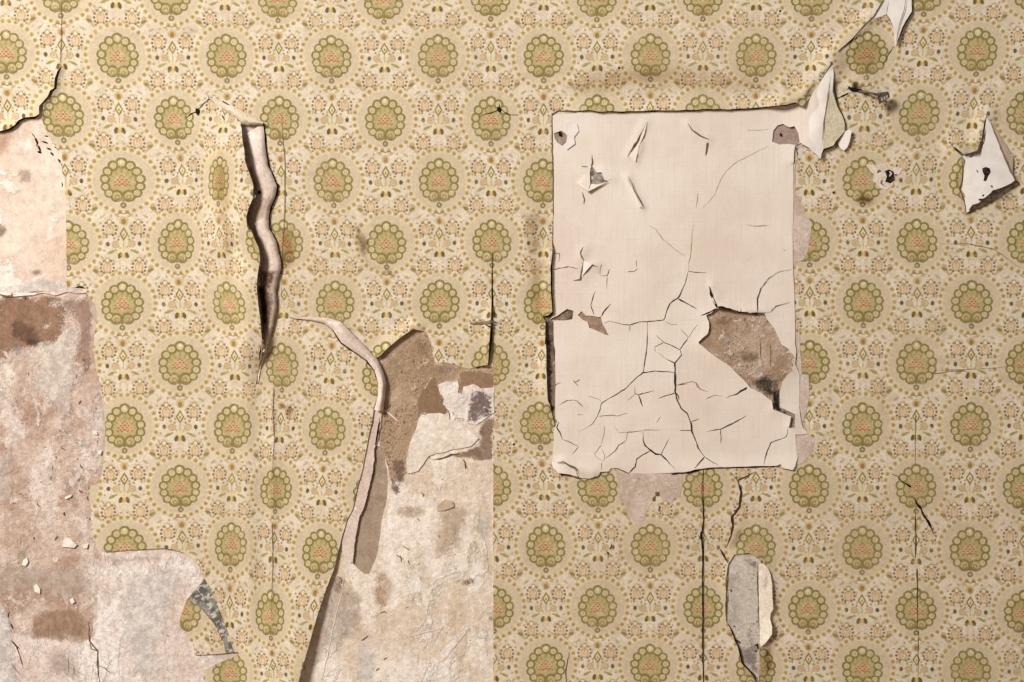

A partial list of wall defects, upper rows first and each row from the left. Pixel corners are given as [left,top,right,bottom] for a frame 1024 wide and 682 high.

peeling [887,0,913,46]
crack [552,102,797,205]
peeling [772,62,852,159]
peeling [952,117,1020,215]
flaking render [0,102,227,682]
flaking render [299,329,495,682]
crack [476,252,493,368]
crack [545,229,789,664]
flaking render [720,550,773,682]
flaking render [699,308,795,429]
crack [892,474,935,648]